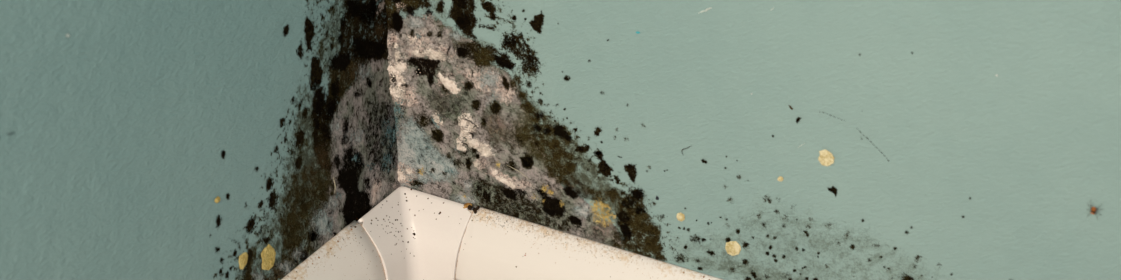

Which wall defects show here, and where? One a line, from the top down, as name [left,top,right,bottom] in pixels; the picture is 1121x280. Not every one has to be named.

water stain [209,0,834,280]
water stain [868,244,952,280]